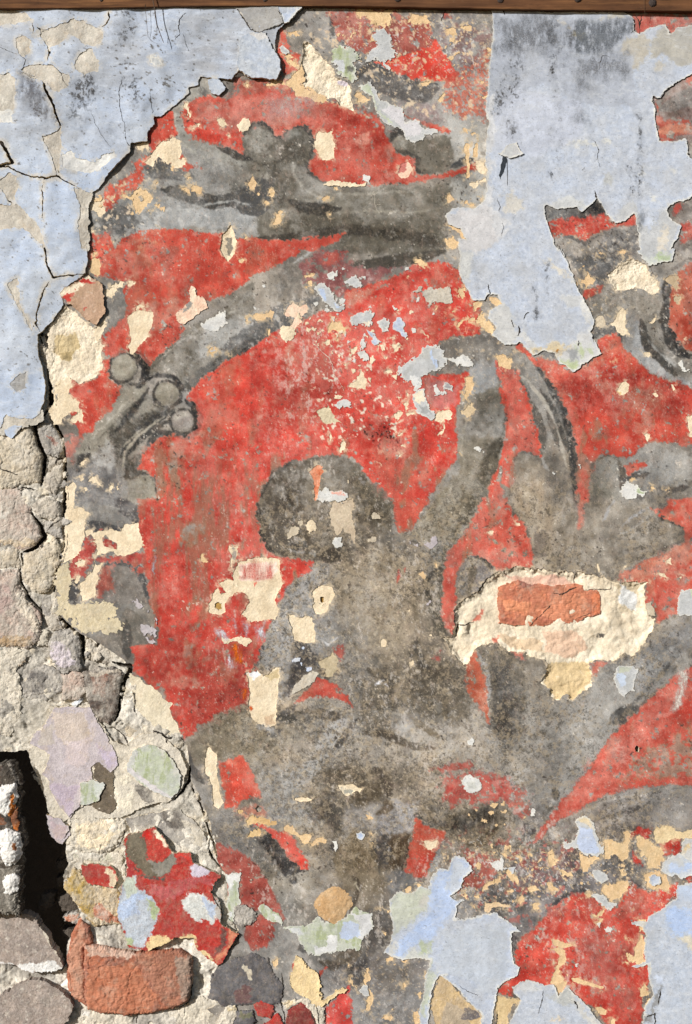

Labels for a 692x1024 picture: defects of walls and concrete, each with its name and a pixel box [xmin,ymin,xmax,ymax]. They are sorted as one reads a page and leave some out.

crack [2,27,68,126]
peeling [237,7,438,143]
crack [0,142,72,197]
crack [35,247,78,344]
spalling [0,172,165,435]
peeling [245,267,501,457]
spalling [53,459,144,635]
crack [1,372,217,862]
spalling [208,545,338,694]
spalling [429,563,655,700]
peeling [462,815,692,932]
peeling [258,904,386,1011]